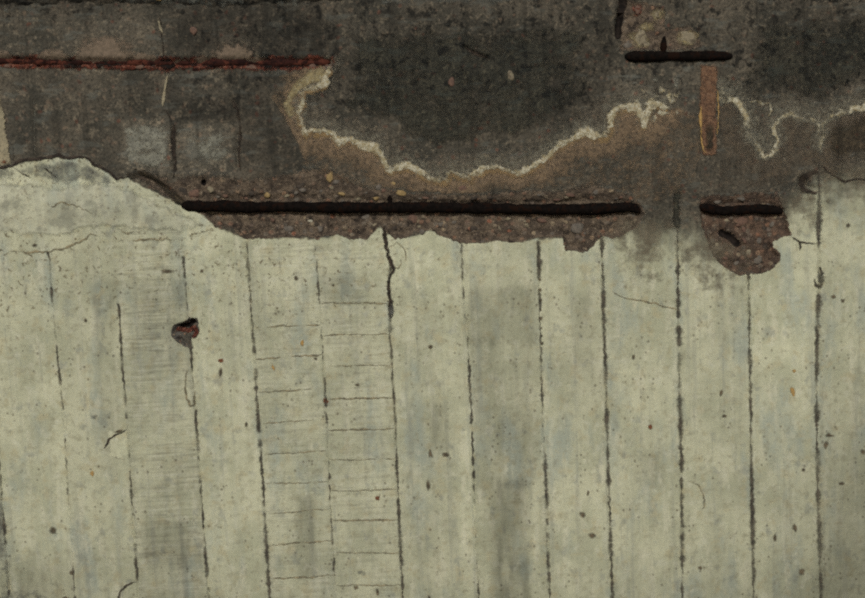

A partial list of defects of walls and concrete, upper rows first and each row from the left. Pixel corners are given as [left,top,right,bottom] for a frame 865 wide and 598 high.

corrosion [0,36,335,72]
leakage [347,27,582,145]
leakage [273,60,699,193]
corrosion [699,65,719,155]
leakage [717,76,865,183]
leakage [753,19,865,95]
spalling [126,168,645,253]
leakage [622,172,680,261]
spalling [700,191,792,276]
spalling [171,317,199,348]
crack [256,226,406,360]